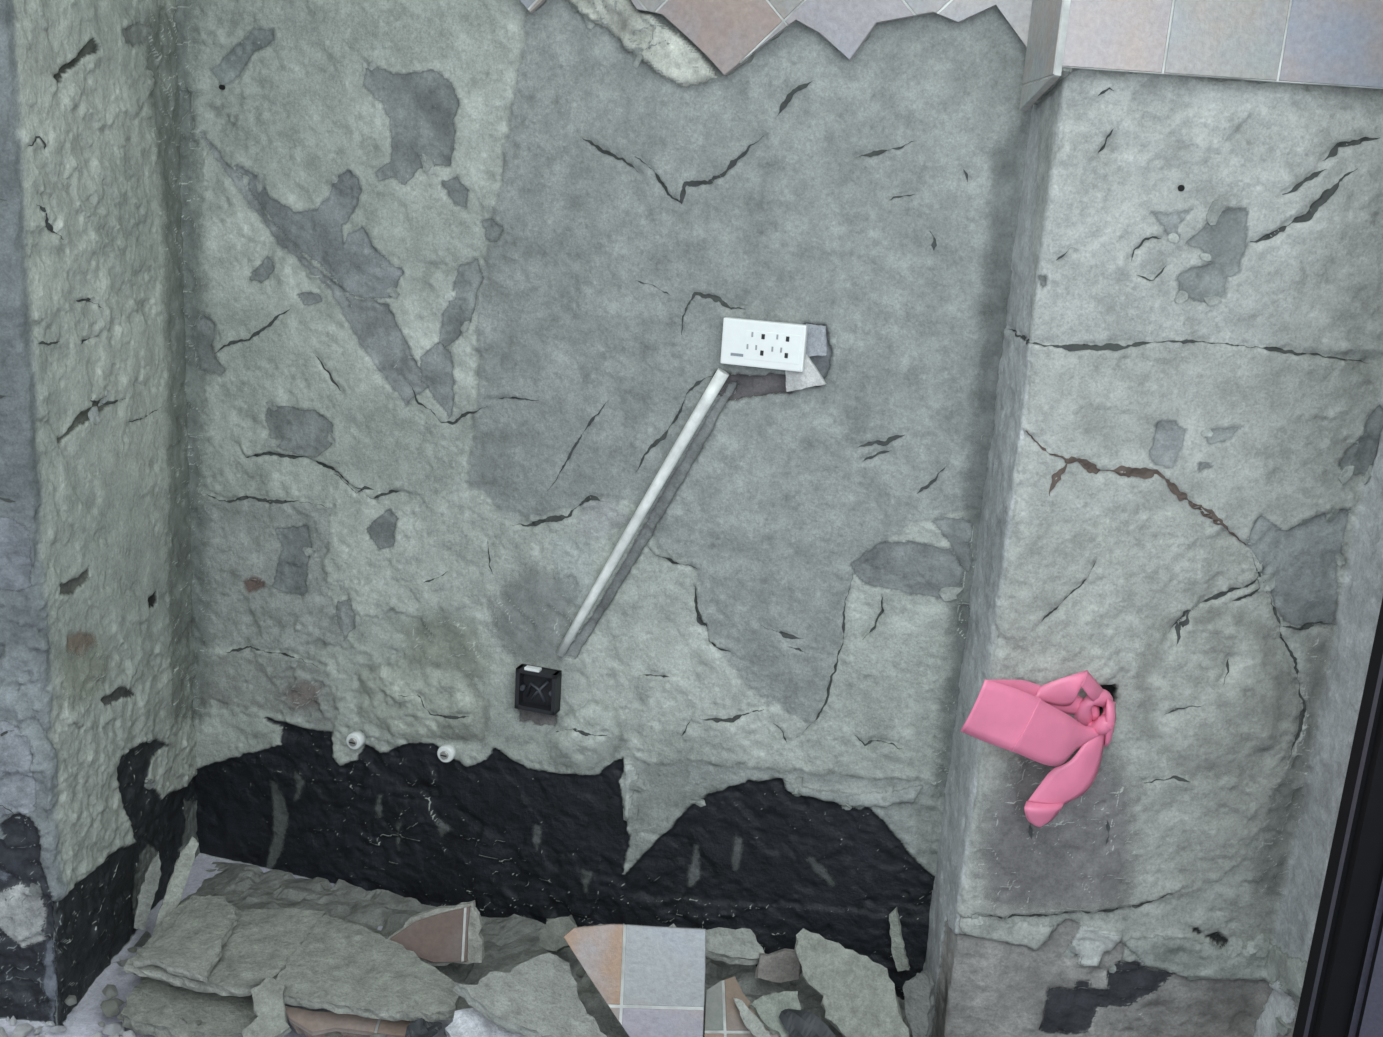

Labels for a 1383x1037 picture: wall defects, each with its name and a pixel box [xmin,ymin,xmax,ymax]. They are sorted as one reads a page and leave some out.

spalling [565,0,718,87]
spalling [362,57,468,207]
crack [583,81,812,204]
crack [1250,137,1379,243]
crack [1010,329,1368,364]
crack [207,452,399,506]
spalling [851,517,972,602]
crack [1025,430,1335,766]
crack [682,574,884,742]
peeling [784,776,923,810]
peeling [0,882,46,948]
spalling [932,914,1308,1037]